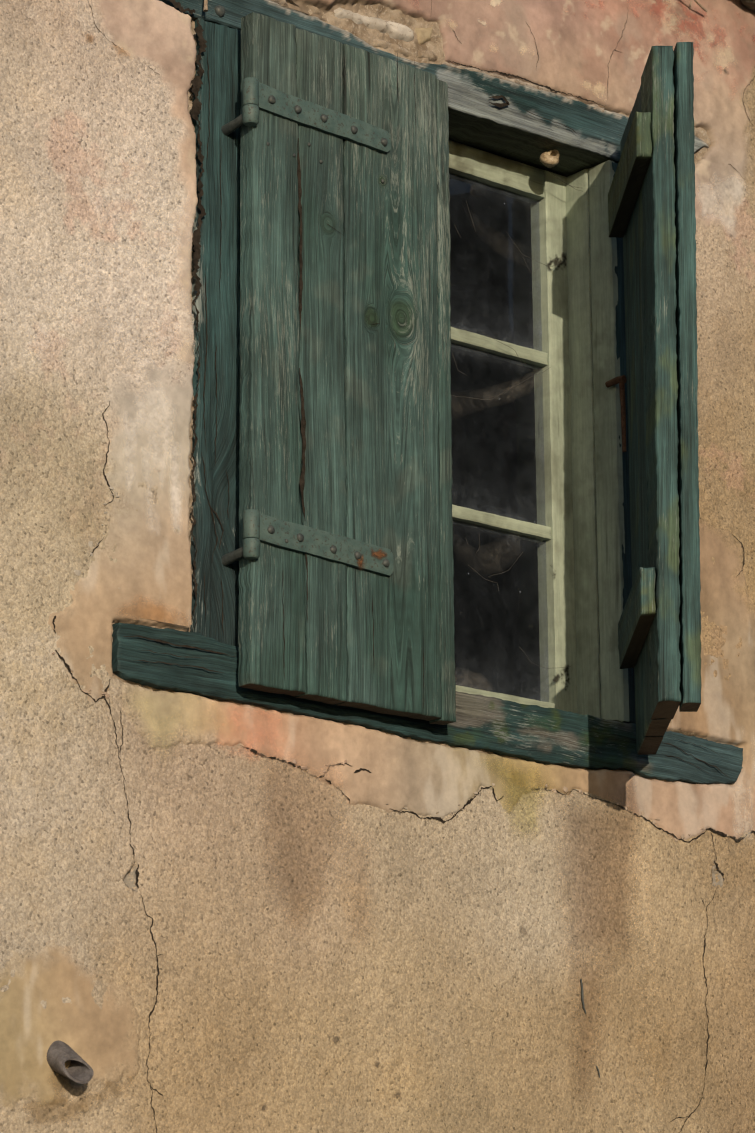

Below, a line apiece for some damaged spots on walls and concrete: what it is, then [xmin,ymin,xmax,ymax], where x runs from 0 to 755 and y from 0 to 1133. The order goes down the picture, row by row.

flaking render [305,5,439,62]
peeling [650,0,732,73]
crack [102,401,114,505]
peeling [48,357,755,841]
crack [669,891,716,1133]